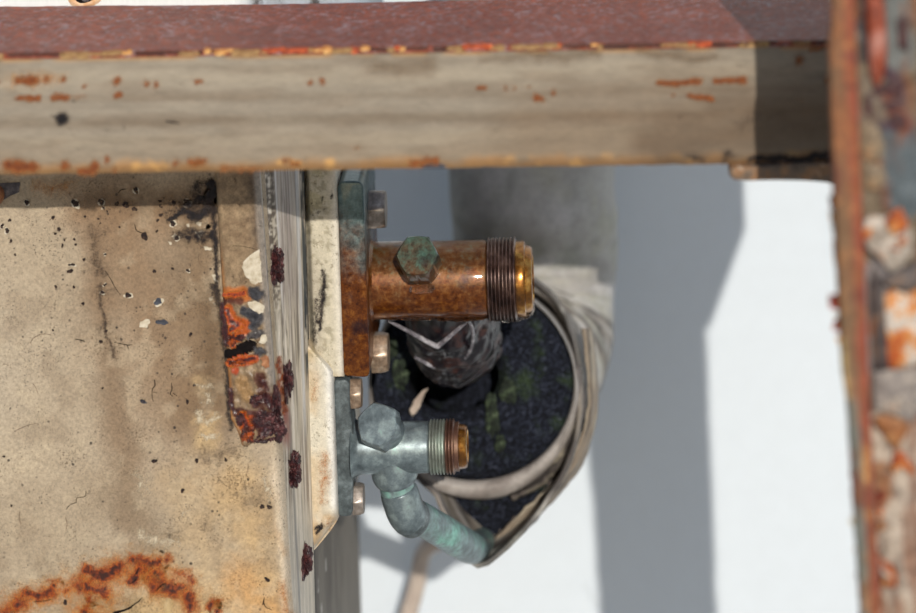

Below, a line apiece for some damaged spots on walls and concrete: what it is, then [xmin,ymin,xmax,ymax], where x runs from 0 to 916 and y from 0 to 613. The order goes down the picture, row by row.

rust [898,14,909,52]
rust [11,74,86,102]
rust [655,76,748,102]
rust [865,77,907,132]
rust [1,159,40,174]
rust [61,156,116,177]
leakage [167,178,233,431]
peeling [248,301,265,314]
rust [0,553,222,613]
crack [113,568,177,613]